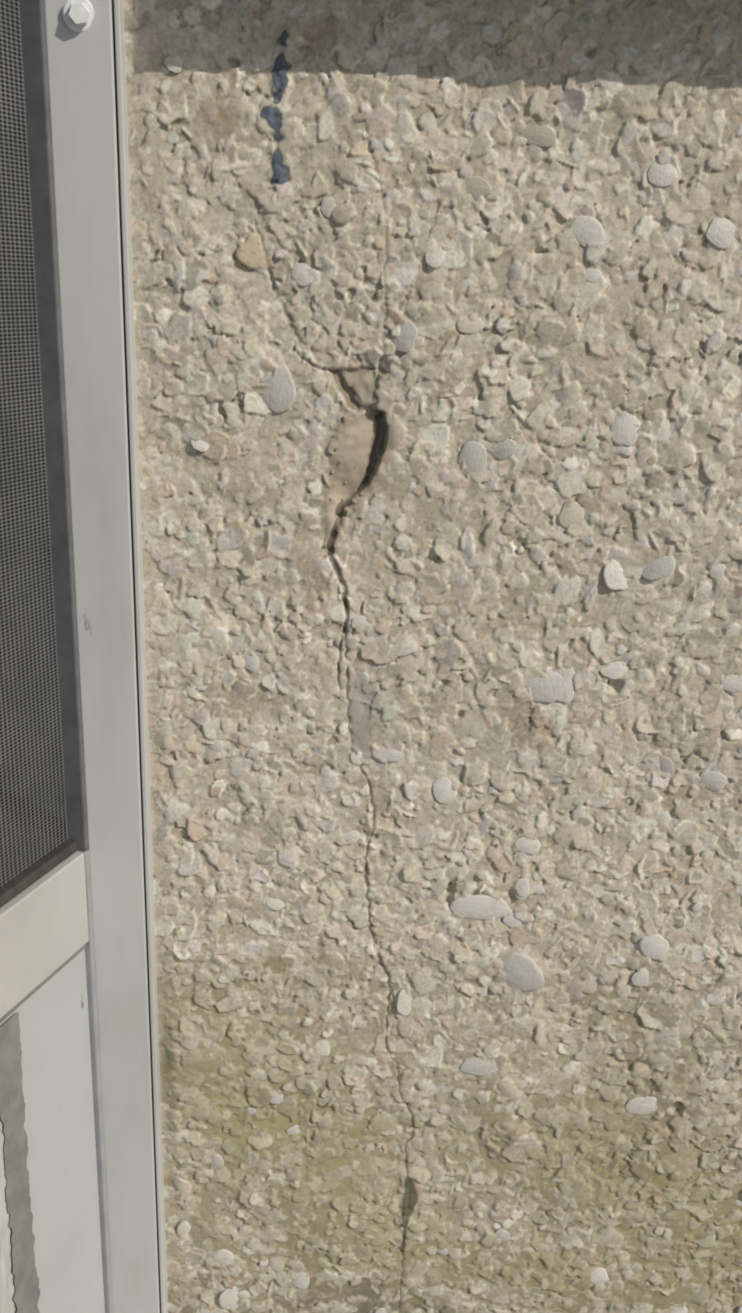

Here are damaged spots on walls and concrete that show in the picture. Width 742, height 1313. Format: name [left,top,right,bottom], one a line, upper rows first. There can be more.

spalling [324,370,393,544]
crack [347,368,377,411]
crack [327,499,352,734]
crack [359,765,414,1168]